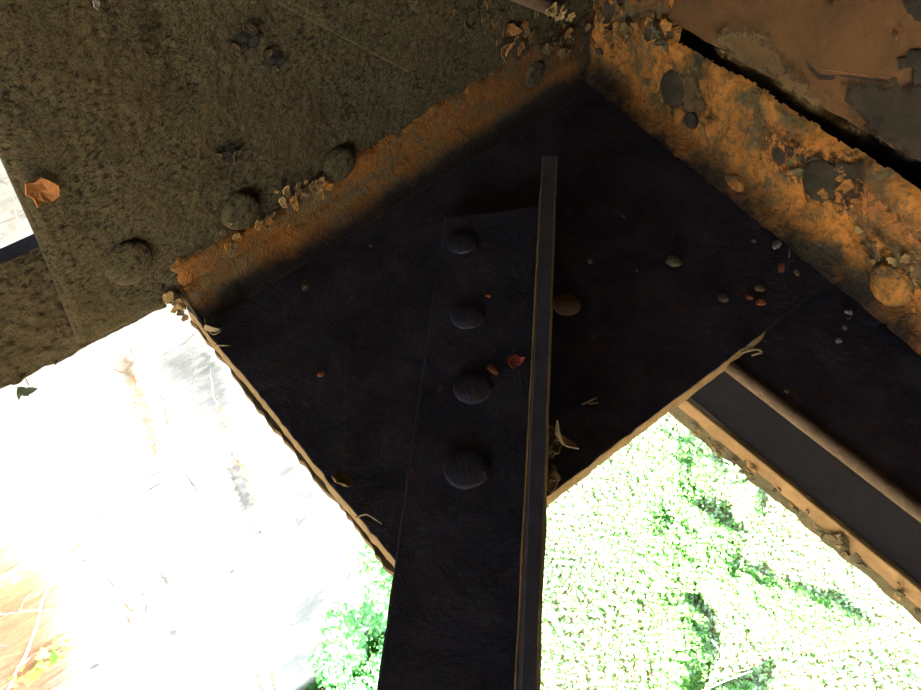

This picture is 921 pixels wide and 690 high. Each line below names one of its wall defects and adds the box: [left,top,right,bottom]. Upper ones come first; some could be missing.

peeling [656,58,716,127]
peeling [716,23,825,111]
rust [254,176,333,232]
peeling [760,115,921,288]
rust [817,161,867,215]
rust [853,226,914,272]
rust [0,562,60,690]